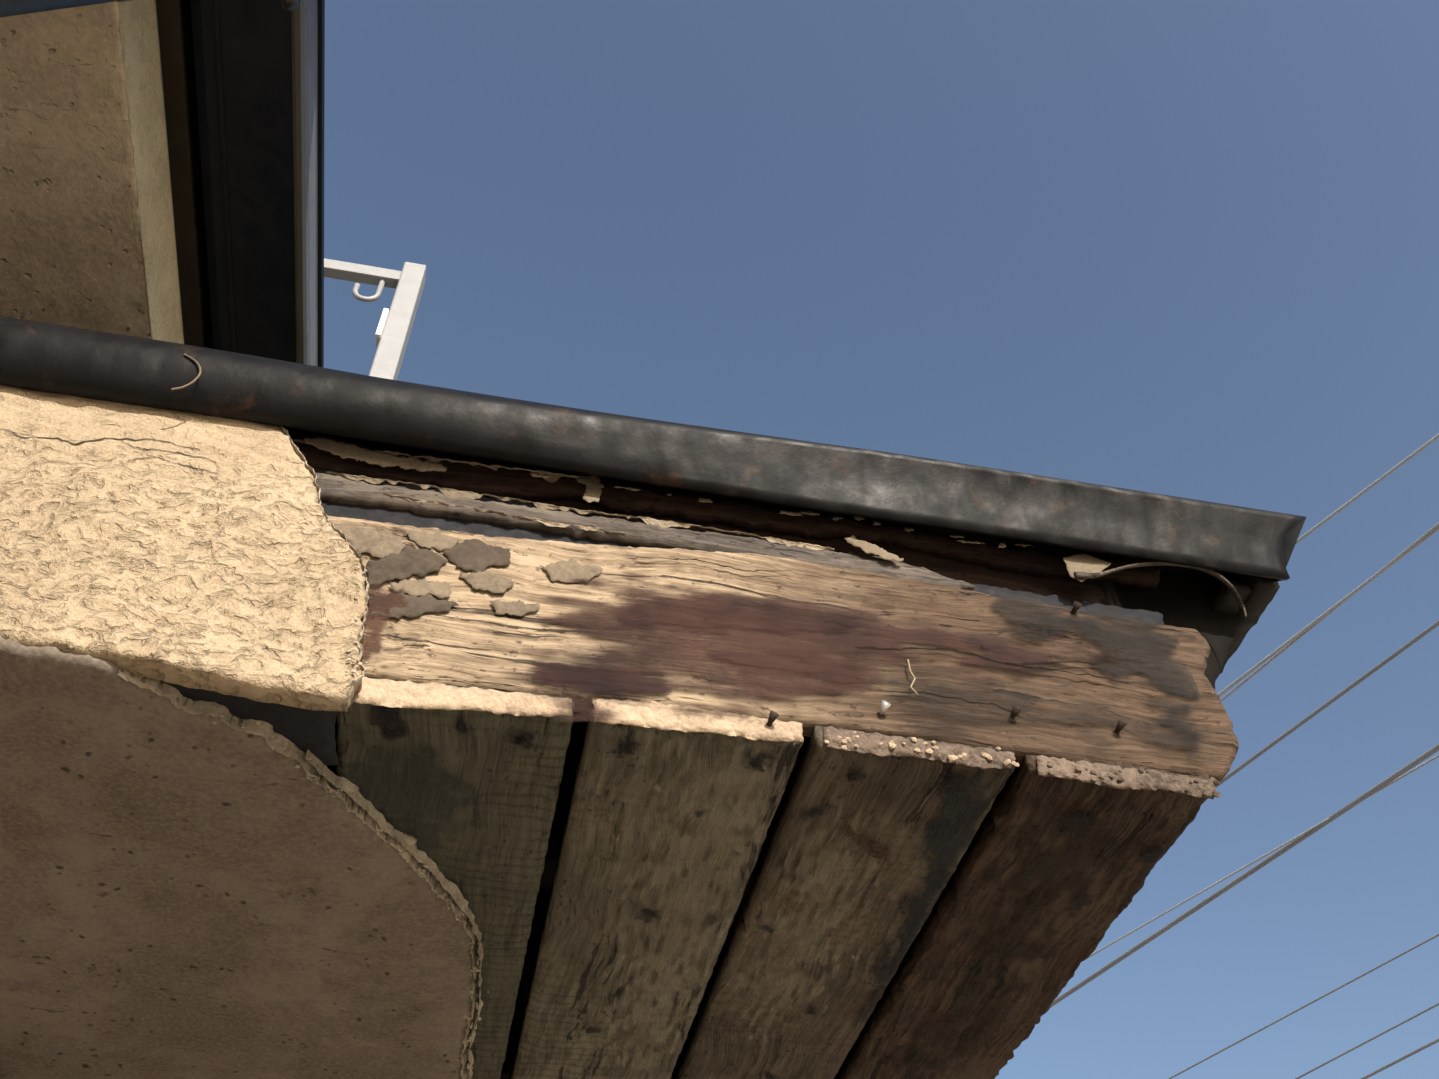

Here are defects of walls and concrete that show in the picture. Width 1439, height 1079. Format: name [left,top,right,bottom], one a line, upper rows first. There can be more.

crack [5,429,219,474]
peeling [279,427,904,707]
leakage [515,572,1203,760]
peeling [950,535,1033,548]
peeling [1063,553,1247,620]
flaking render [117,668,489,1079]